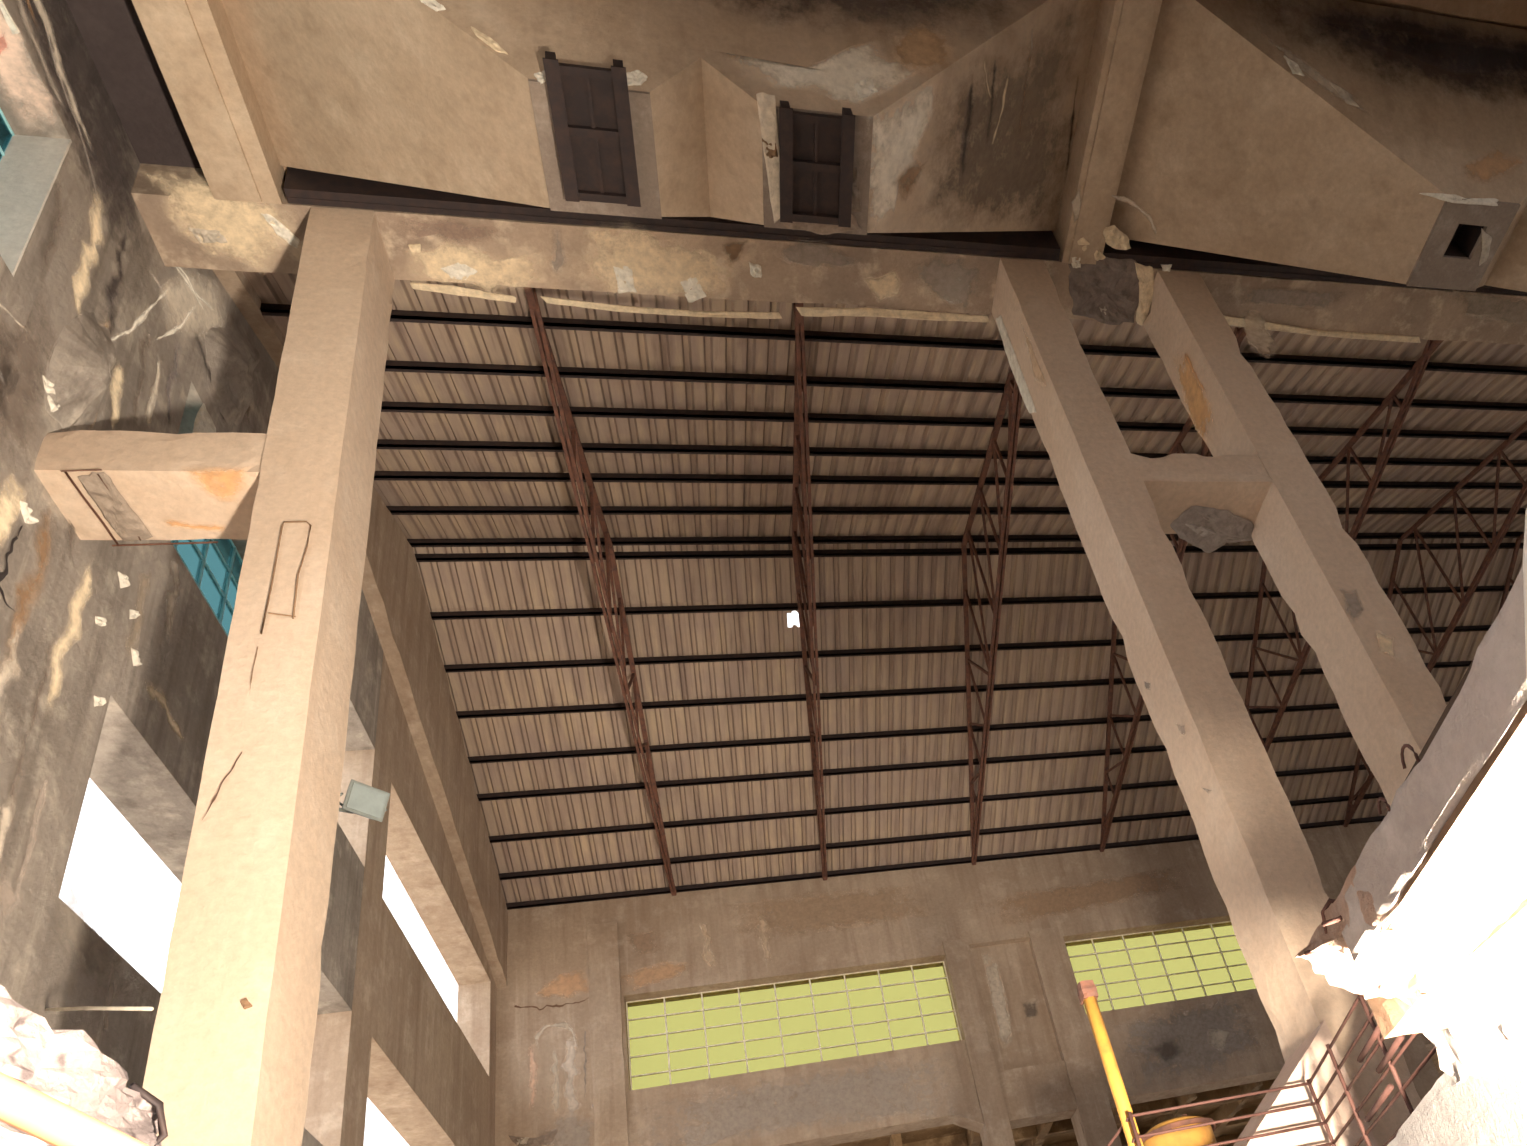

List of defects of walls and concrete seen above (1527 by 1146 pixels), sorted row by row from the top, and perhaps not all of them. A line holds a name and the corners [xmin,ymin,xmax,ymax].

water stain [742,0,978,100]
water stain [1305,9,1527,97]
water stain [872,92,932,213]
water stain [935,15,1076,218]
water stain [19,0,219,423]
peeling [177,185,300,261]
spalling [1068,225,1172,326]
crack [0,525,23,610]
spalling [1170,506,1254,553]
spalling [1295,850,1527,1007]
spalling [508,1128,559,1146]